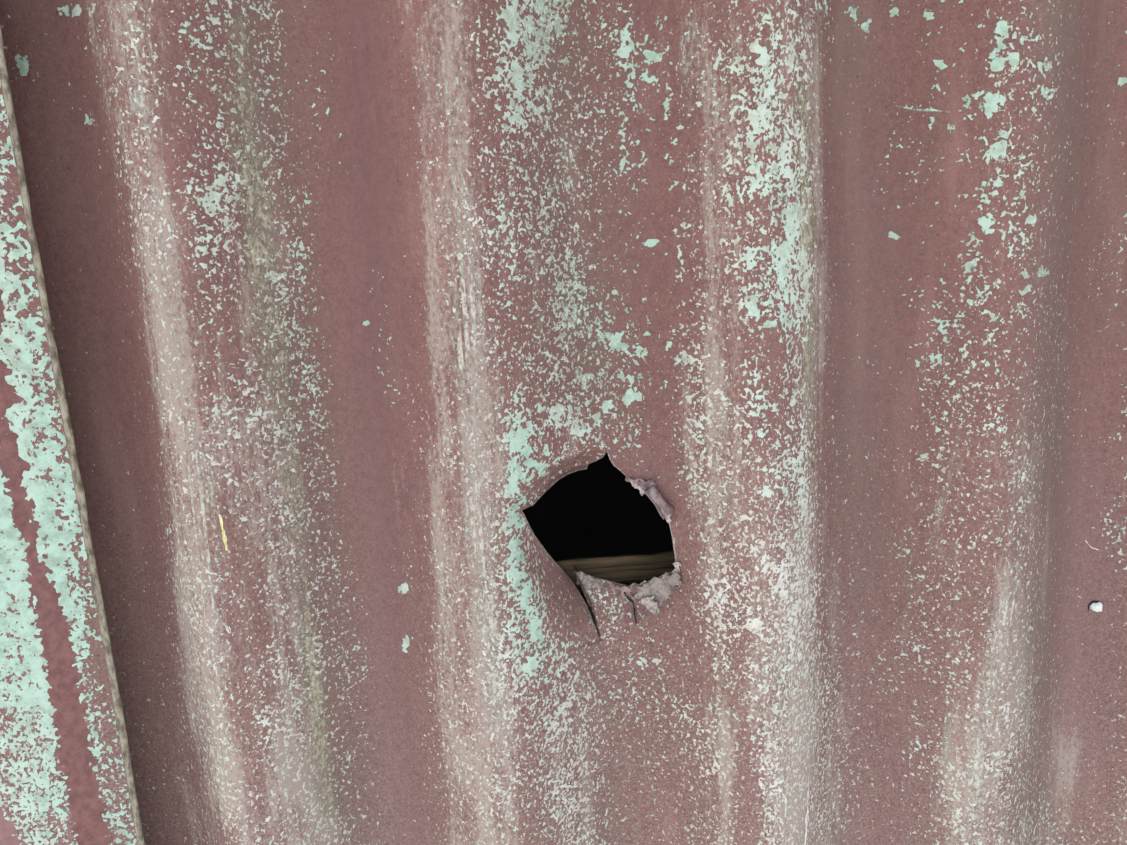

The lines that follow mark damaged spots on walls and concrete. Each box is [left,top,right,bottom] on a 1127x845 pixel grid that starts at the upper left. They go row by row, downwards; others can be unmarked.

peeling [15,54,39,81]
peeling [57,0,378,845]
peeling [363,304,422,427]
peeling [387,0,1074,845]
peeling [1077,496,1127,616]